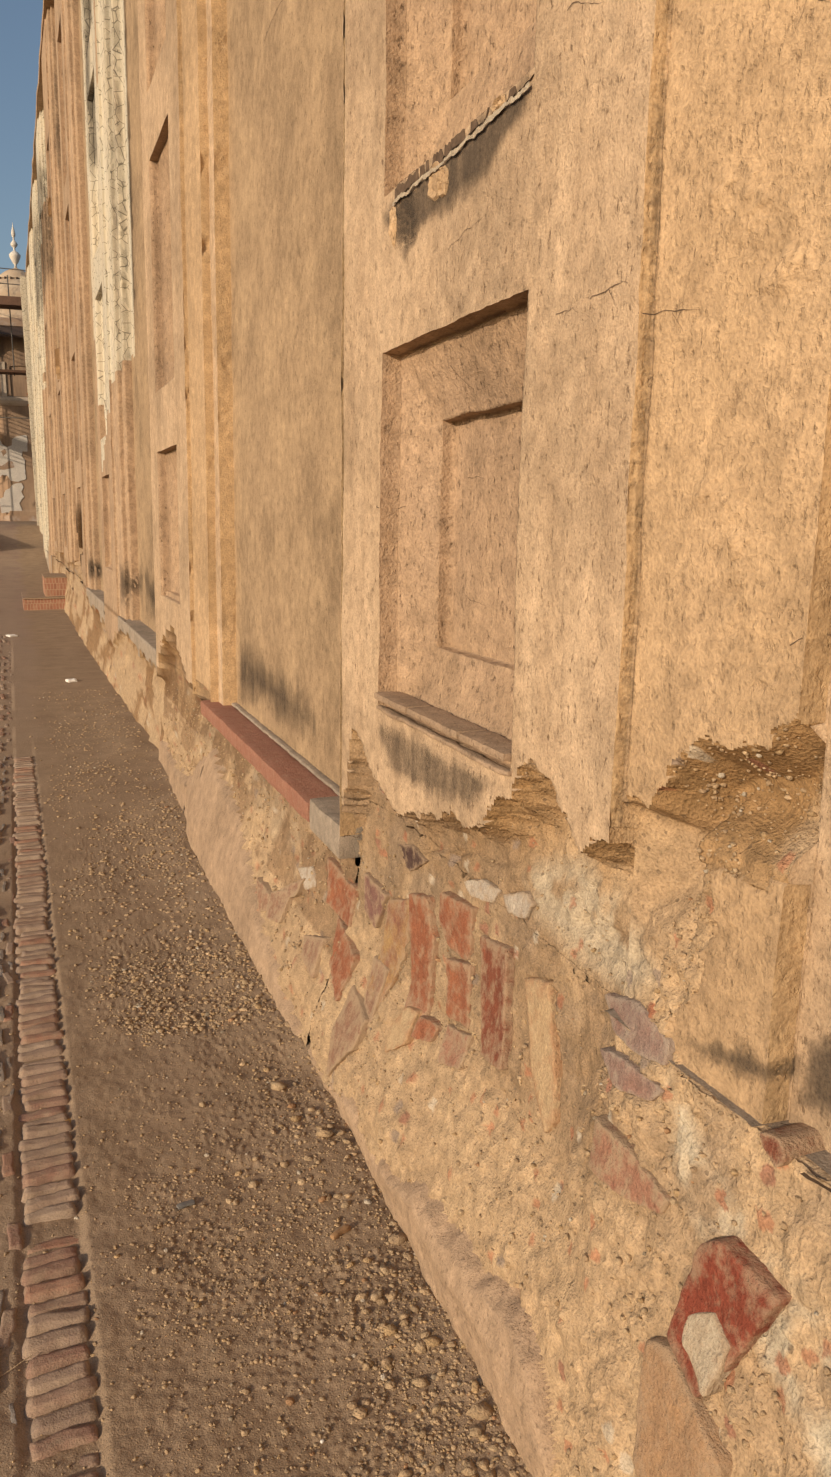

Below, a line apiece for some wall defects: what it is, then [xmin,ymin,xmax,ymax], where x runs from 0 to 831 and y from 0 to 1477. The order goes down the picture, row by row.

peeling [427,161,449,201]
peeling [388,205,397,248]
peeling [26,108,52,557]
peeling [0,435,28,513]
spalling [51,548,831,1477]